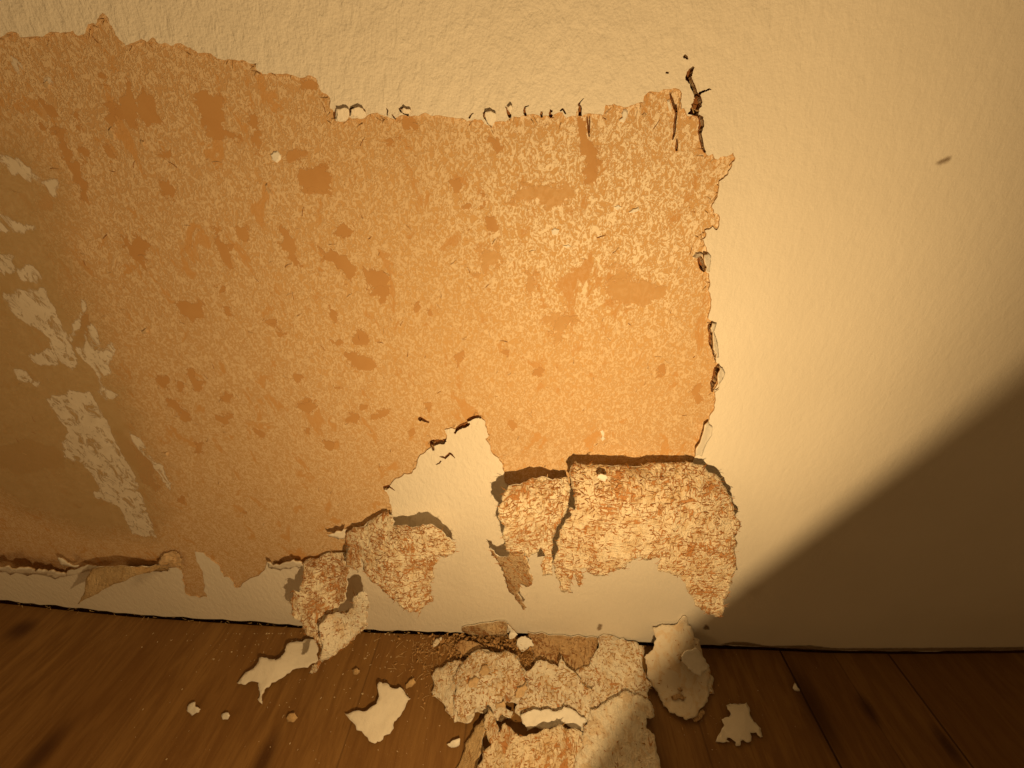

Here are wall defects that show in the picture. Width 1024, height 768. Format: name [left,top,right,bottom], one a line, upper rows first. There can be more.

peeling [0,14,742,674]
crack [685,67,711,153]